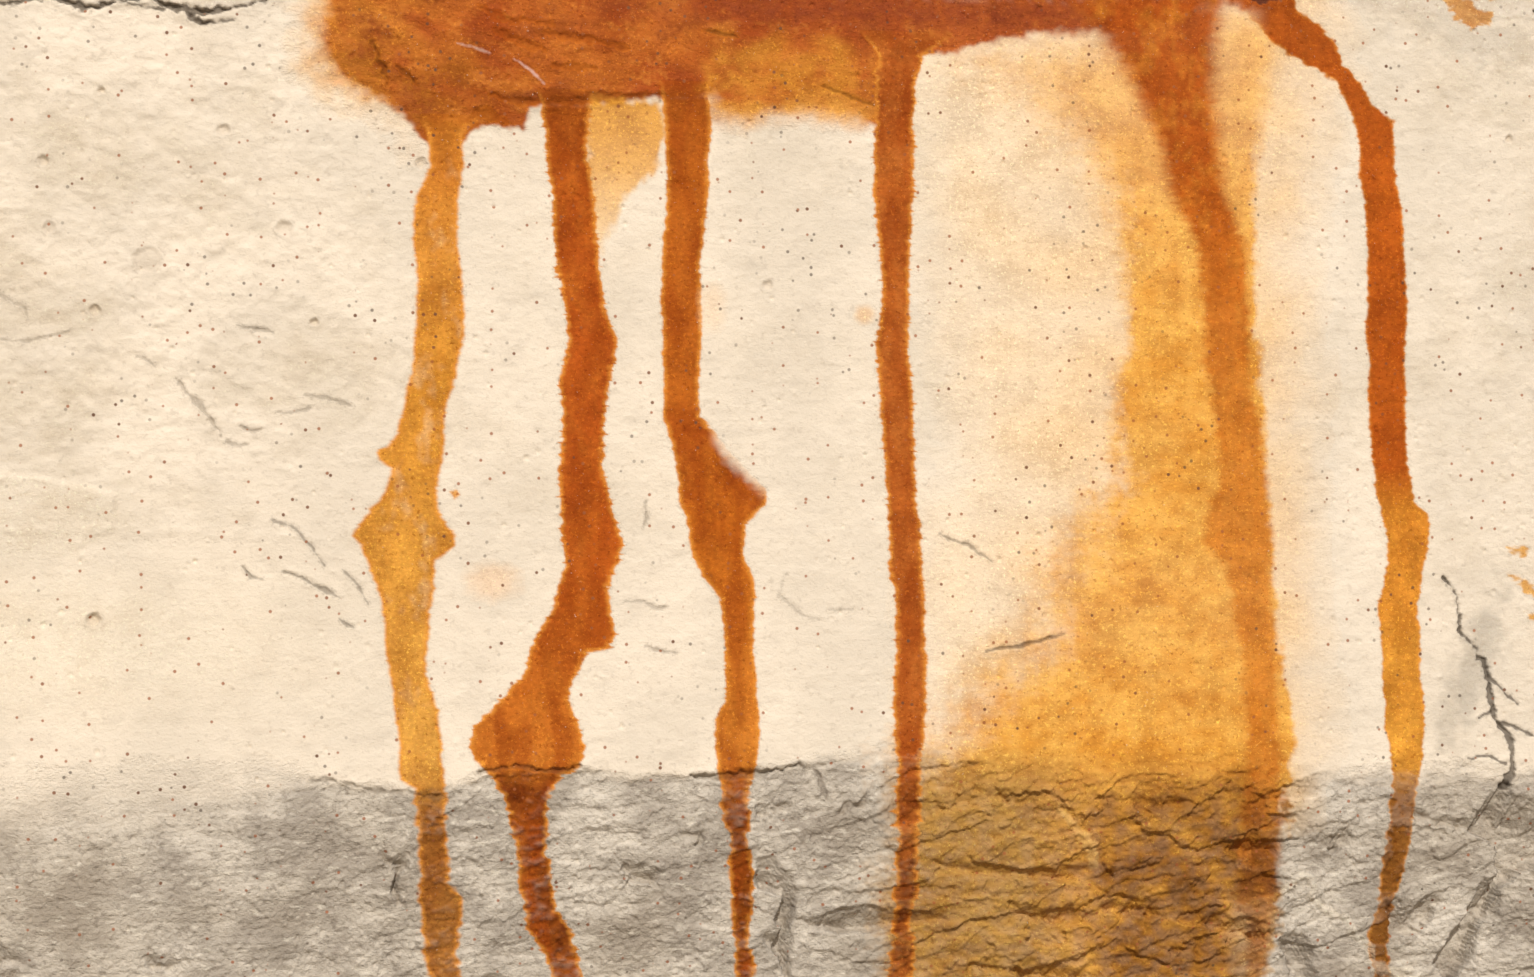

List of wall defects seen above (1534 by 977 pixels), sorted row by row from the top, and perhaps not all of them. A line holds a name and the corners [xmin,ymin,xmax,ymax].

crack [0,0,270,27]
corrosion [1441,0,1496,33]
corrosion [271,0,1433,977]
crack [1440,574,1534,792]
corrosion [1504,544,1534,621]
spalling [0,752,426,977]
spalling [447,740,886,977]
spalling [1269,751,1534,977]